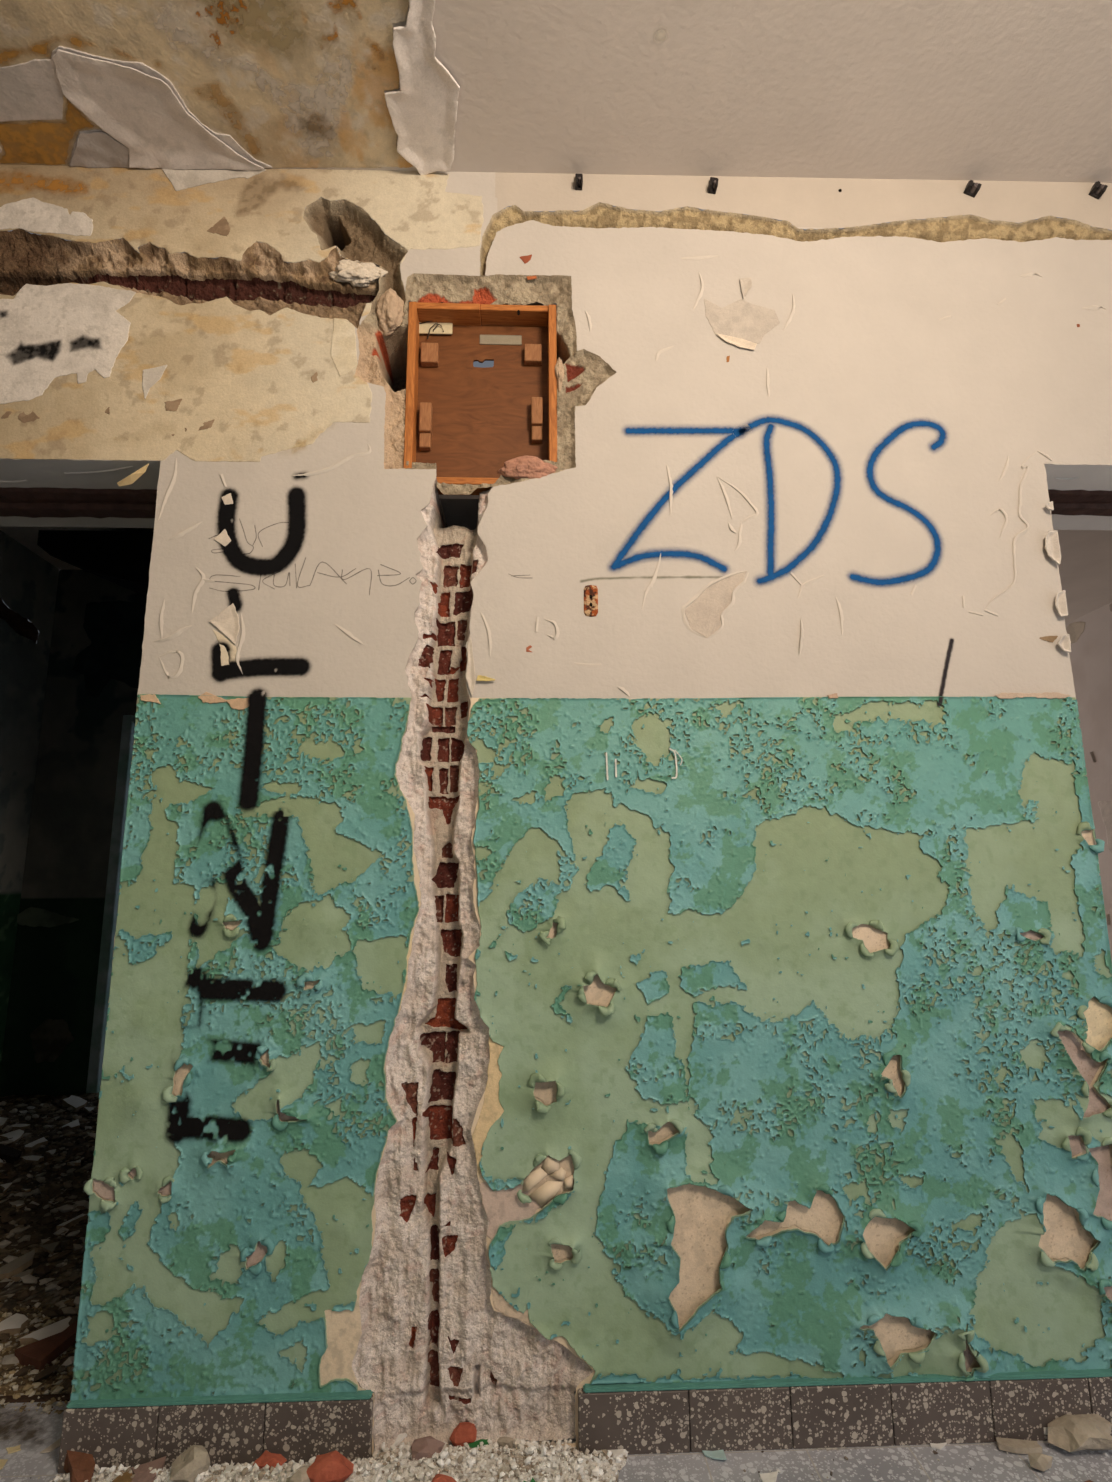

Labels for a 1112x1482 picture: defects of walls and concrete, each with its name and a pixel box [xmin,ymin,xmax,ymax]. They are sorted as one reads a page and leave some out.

flaking render [0,0,616,495]
peeling [704,277,780,350]
peeling [14,600,419,1401]
crack [352,477,593,1452]
peeling [467,692,1112,1385]